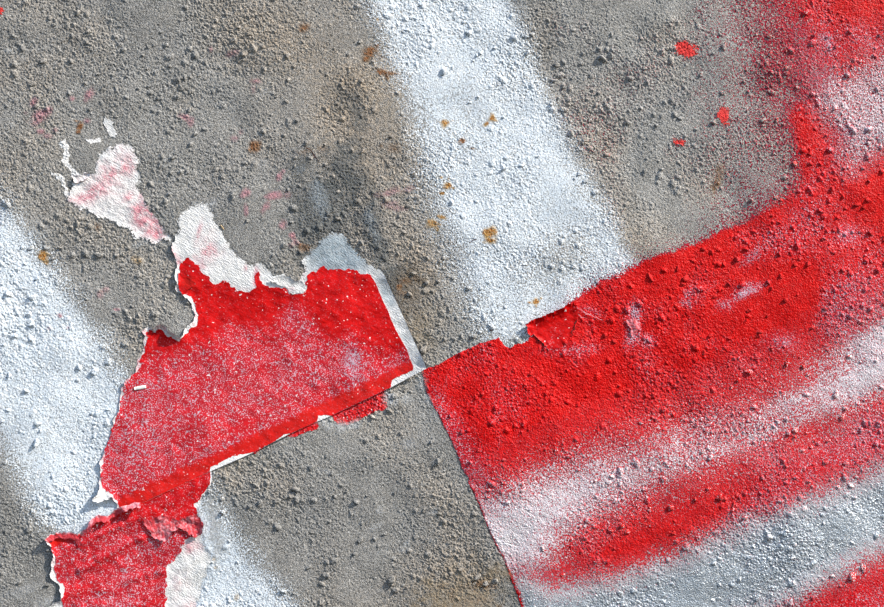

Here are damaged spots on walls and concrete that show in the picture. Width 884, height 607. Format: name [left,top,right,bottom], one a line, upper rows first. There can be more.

peeling [86,117,117,144]
peeling [332,389,388,426]
peeling [285,421,319,437]